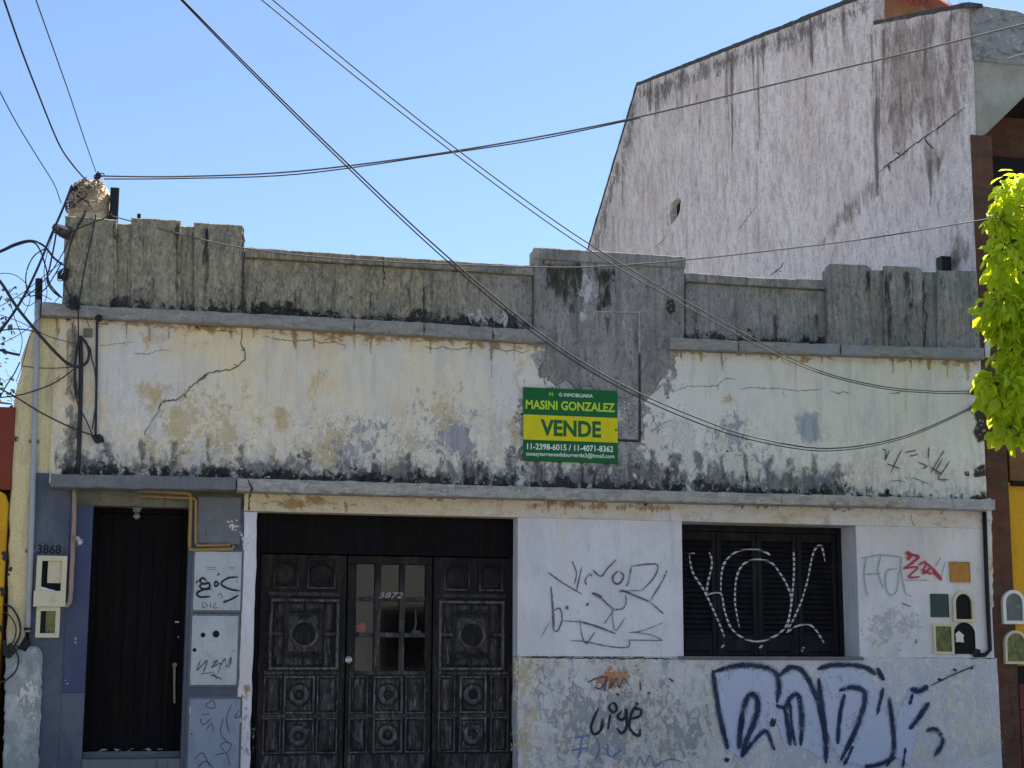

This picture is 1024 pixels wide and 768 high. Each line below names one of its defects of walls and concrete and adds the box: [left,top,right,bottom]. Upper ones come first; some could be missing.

leakage [595,1,870,248]
leakage [824,9,967,240]
crack [879,108,964,172]
crack [144,228,355,435]
leakage [67,280,530,329]
rust [312,332,453,351]
leakage [542,260,616,331]
peeling [140,385,248,475]
peeling [253,385,463,476]
peeling [505,372,533,478]
leakage [56,316,988,508]
peeling [545,351,769,492]